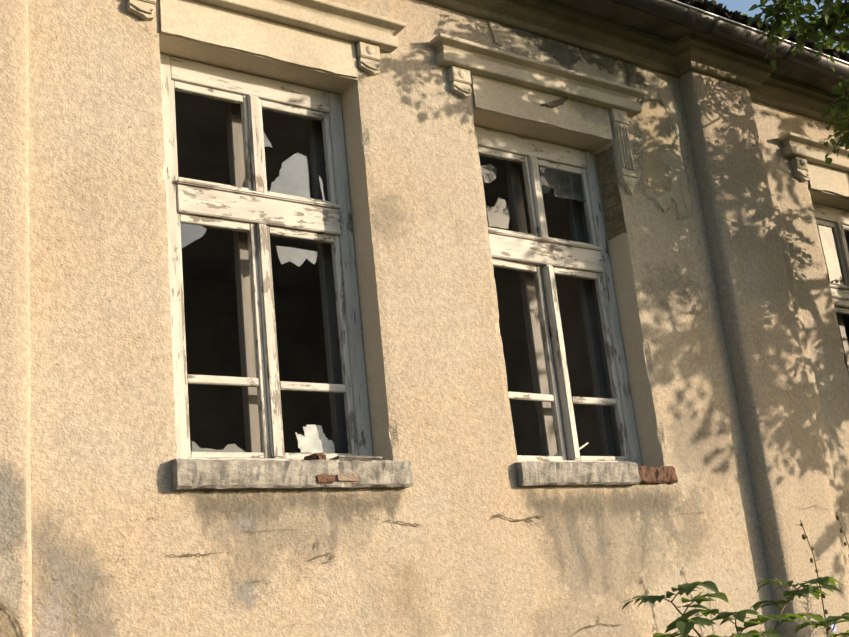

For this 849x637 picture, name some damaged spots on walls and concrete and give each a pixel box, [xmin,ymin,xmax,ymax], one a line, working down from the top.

peeling [488,21,692,220]
water stain [193,491,399,528]
crack [383,508,421,526]
crack [491,511,544,525]
water stain [529,491,671,515]
crack [309,541,335,563]
crack [571,614,622,636]